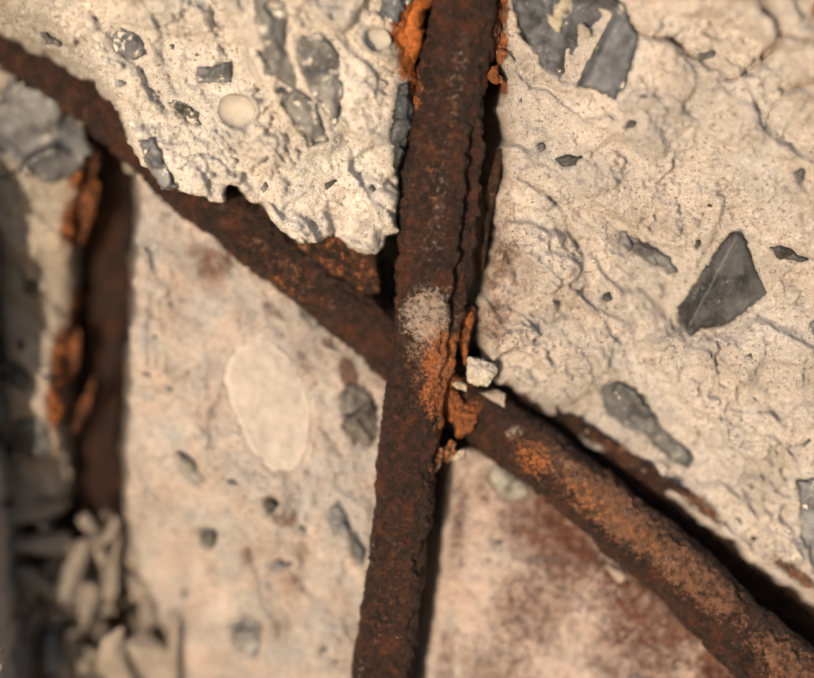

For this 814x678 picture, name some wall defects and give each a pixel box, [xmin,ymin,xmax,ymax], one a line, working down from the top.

rust [389,0,434,97]
rust [487,0,510,95]
rust [59,156,87,248]
rust [280,232,385,294]
rust [44,283,82,433]
spalling [0,34,396,678]
rust [340,357,368,393]
rust [470,347,487,361]
spalling [351,0,814,678]
rust [491,377,814,647]